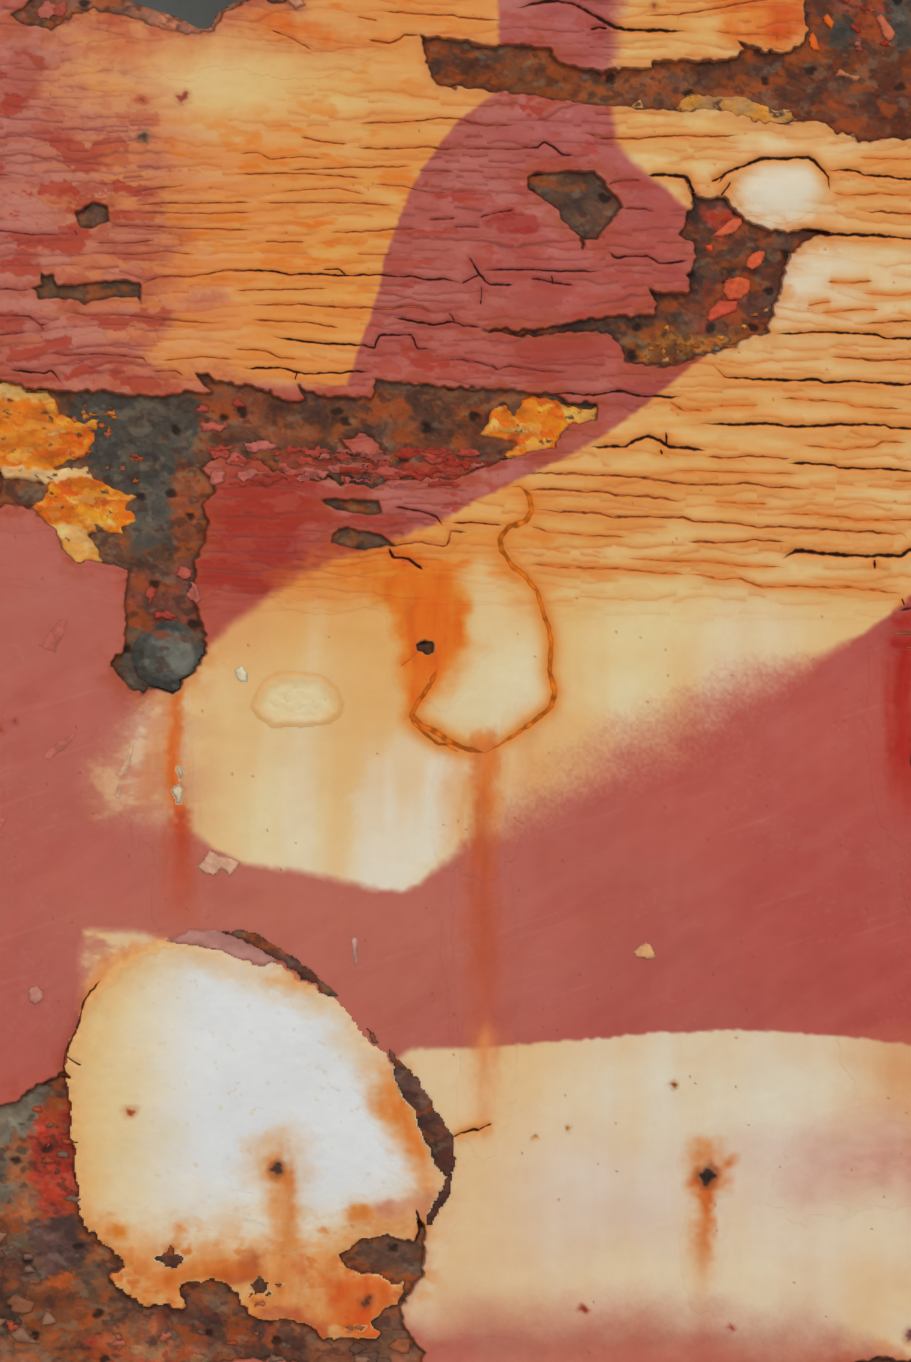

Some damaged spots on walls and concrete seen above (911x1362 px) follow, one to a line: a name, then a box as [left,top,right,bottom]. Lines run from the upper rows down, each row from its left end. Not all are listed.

corrosion [132,127,155,147]
corrosion [12,0,911,142]
crack [361,0,782,44]
corrosion [528,172,621,243]
corrosion [490,194,830,368]
crack [0,117,911,752]
corrosion [0,374,596,1020]
corrosion [0,694,753,1362]
corrosion [767,1016,911,1228]
corrosion [858,1324,911,1362]